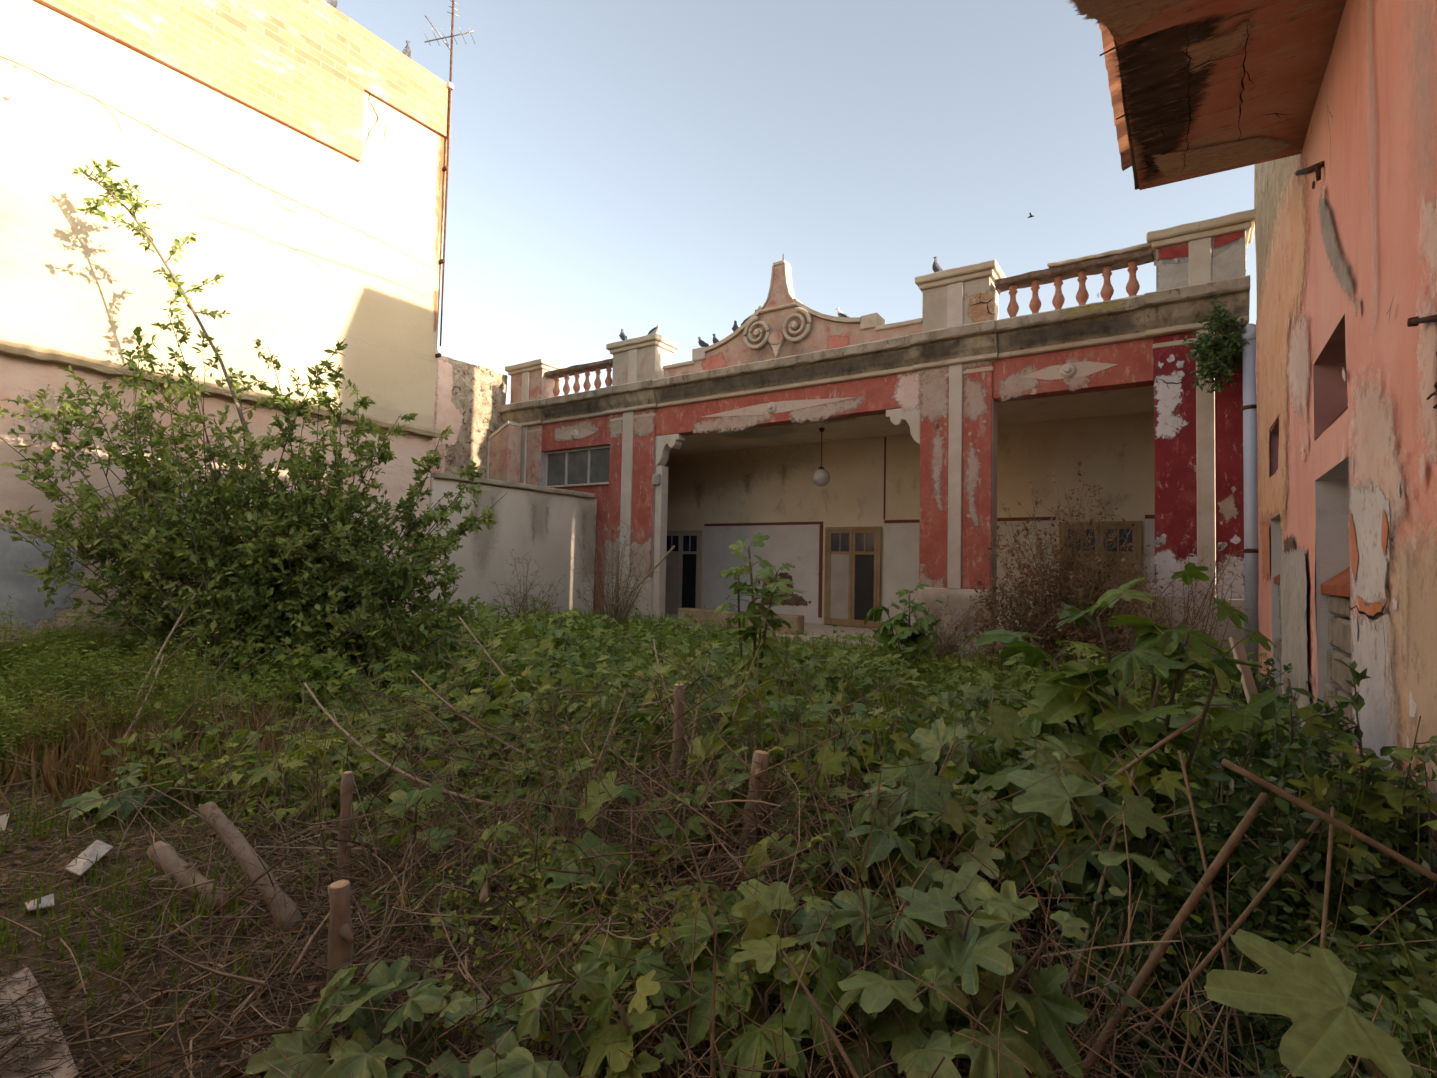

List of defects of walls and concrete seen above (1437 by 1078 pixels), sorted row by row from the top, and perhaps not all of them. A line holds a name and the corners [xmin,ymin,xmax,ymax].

crack [0,53,429,295]
damp [1108,16,1225,188]
peeling [693,396,863,433]
peeling [892,360,1039,533]
spalling [963,289,1001,323]
peeling [1151,534,1197,597]
peeling [1216,486,1245,599]
peeling [1151,135,1358,580]
peeling [1341,196,1437,785]